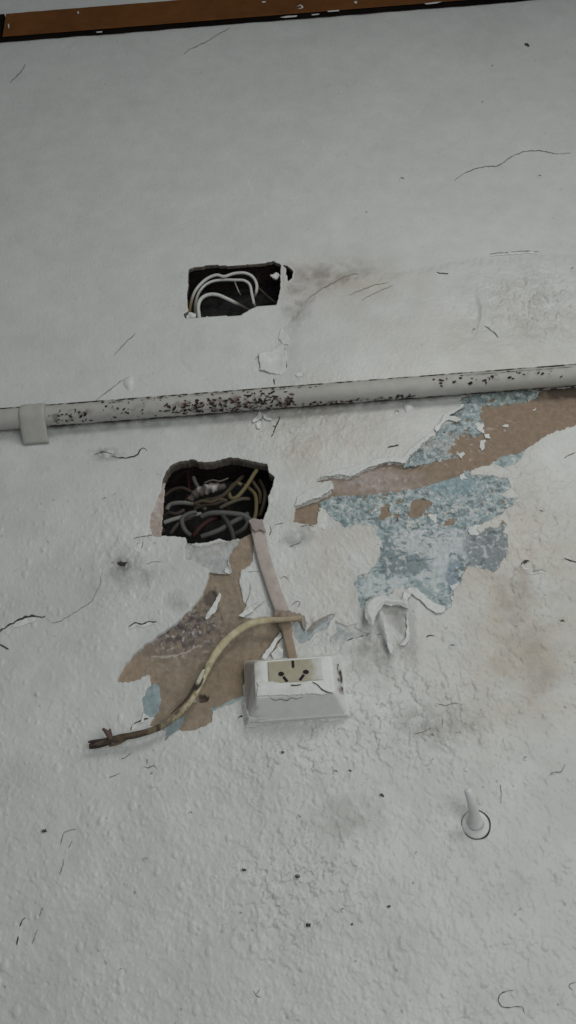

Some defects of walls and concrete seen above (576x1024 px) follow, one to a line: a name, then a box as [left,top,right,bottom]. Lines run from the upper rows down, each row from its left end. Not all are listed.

crack [455,150,566,180]
rust [101,386,416,420]
peeling [118,387,576,741]
crack [0,582,101,650]